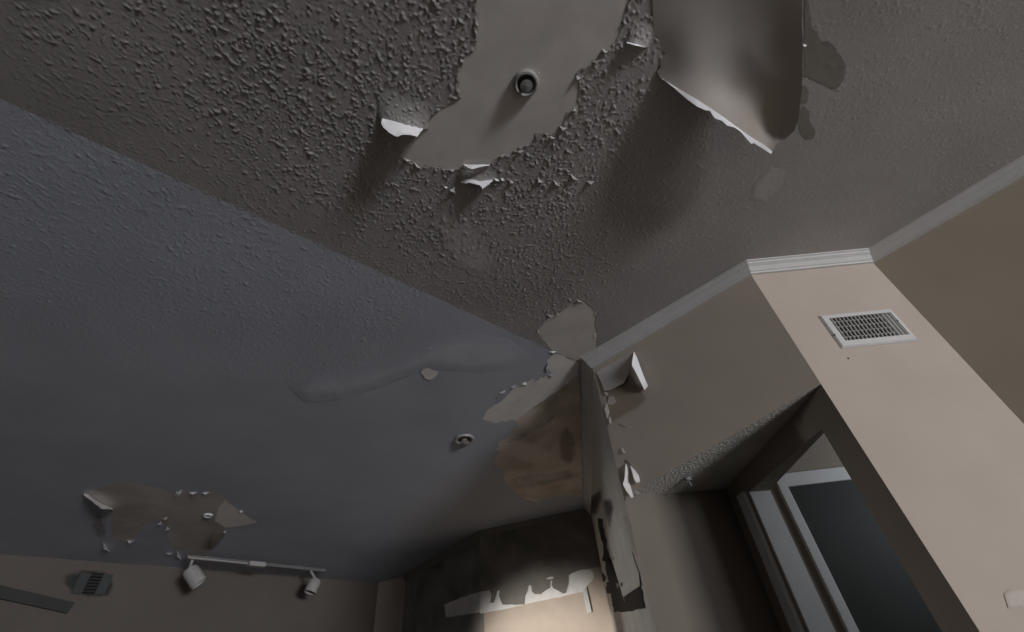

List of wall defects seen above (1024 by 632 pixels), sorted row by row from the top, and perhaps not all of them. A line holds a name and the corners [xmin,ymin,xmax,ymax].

peeling [401,0,628,172]
peeling [798,0,846,139]
peeling [483,299,597,423]
peeling [597,351,648,424]
peeling [84,482,257,560]
damp [479,375,628,612]
peeling [444,591,480,617]